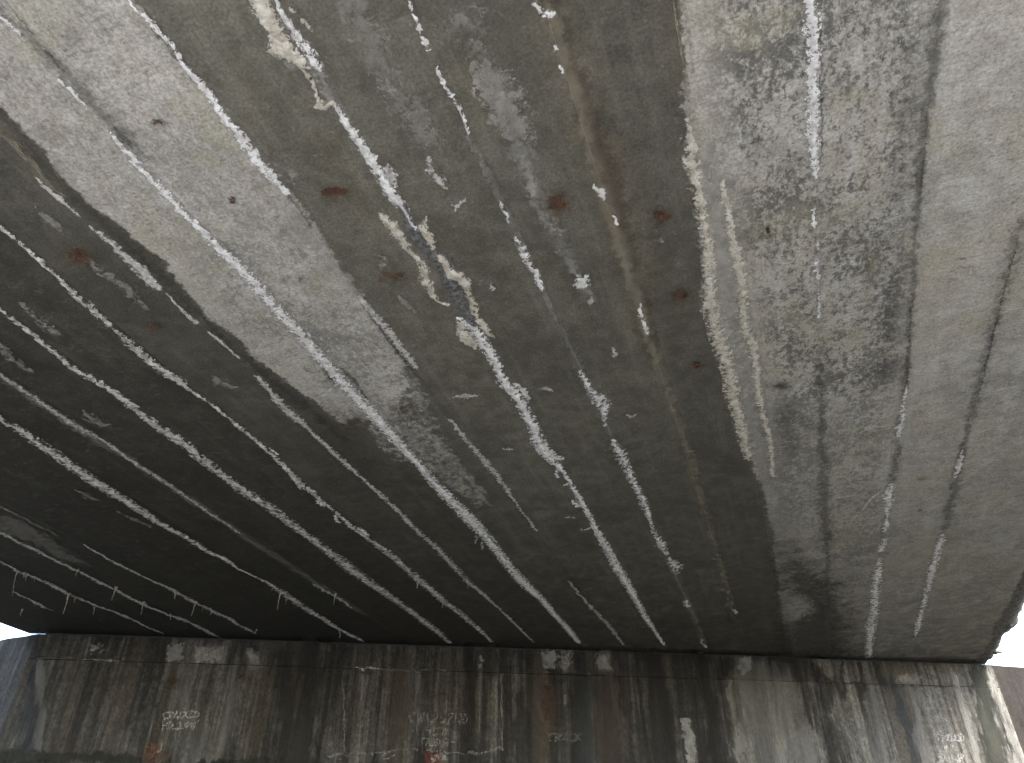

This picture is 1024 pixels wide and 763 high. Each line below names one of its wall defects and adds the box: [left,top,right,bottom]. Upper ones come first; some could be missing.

efflorescence [57,78,87,110]
efflorescence [128,0,291,195]
efflorescence [802,0,824,180]
efflorescence [36,178,80,217]
damp [679,91,789,486]
efflorescence [813,241,822,320]
efflorescence [110,132,580,643]
damp [0,225,498,763]
efflorescence [611,439,683,574]
damp [692,483,932,763]
efflorescence [914,534,947,636]
damp [952,661,1020,763]